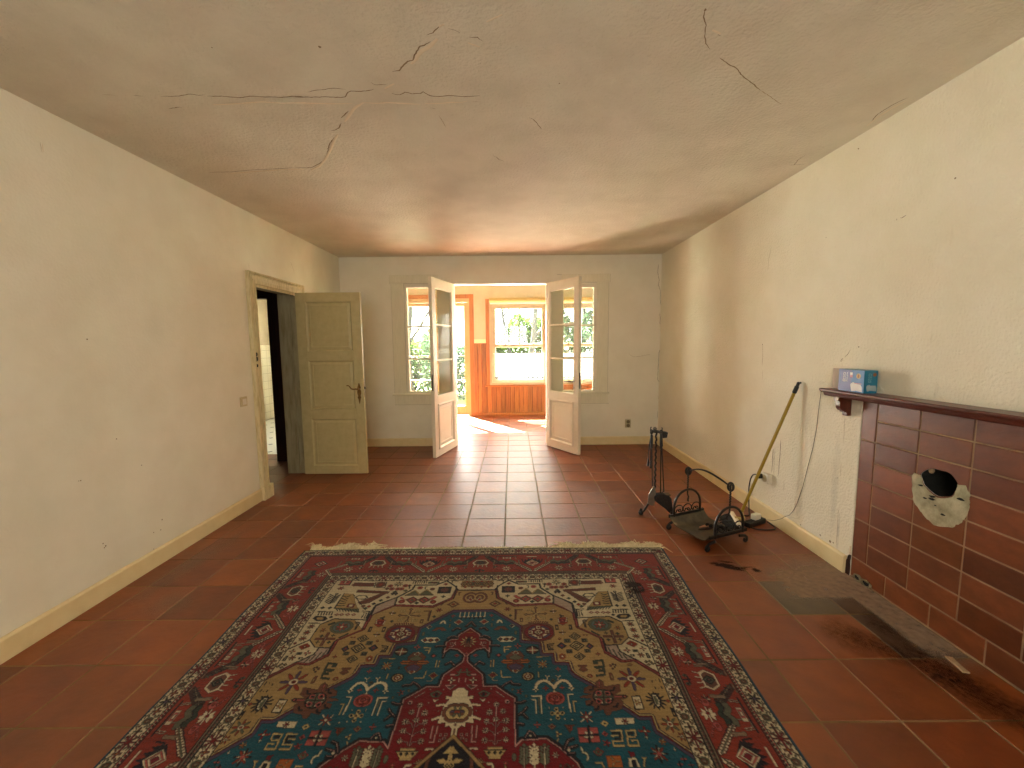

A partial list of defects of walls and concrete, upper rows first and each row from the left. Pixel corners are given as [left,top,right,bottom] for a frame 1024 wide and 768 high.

crack [168,14,502,174]
crack [703,11,781,104]